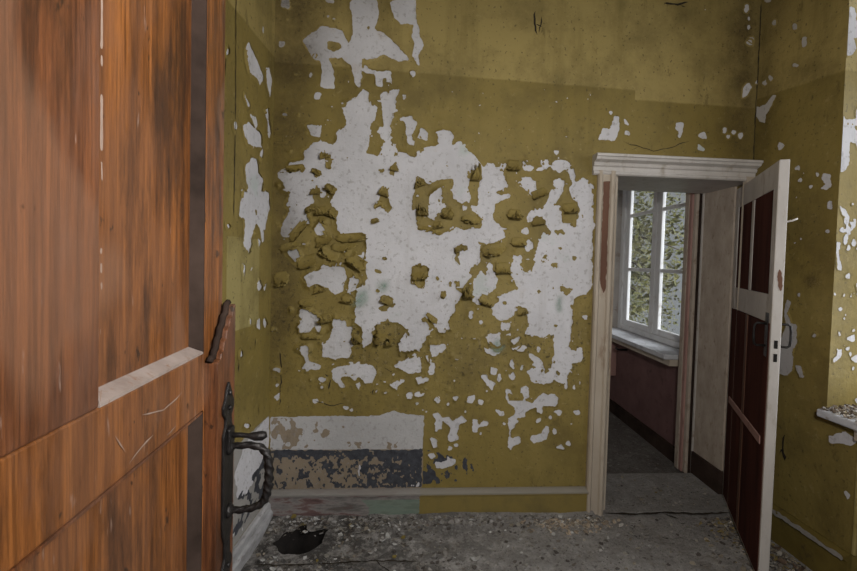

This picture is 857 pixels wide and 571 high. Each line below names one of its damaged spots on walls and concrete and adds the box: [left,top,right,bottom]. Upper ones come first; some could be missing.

spalling [742,3,755,47]
peeling [847,6,857,57]
spalling [741,74,777,123]
spalling [674,120,686,140]
spalling [695,132,709,153]
spalling [721,126,744,140]
peeling [794,108,857,321]
peeling [225,0,630,547]
spalling [832,328,857,371]